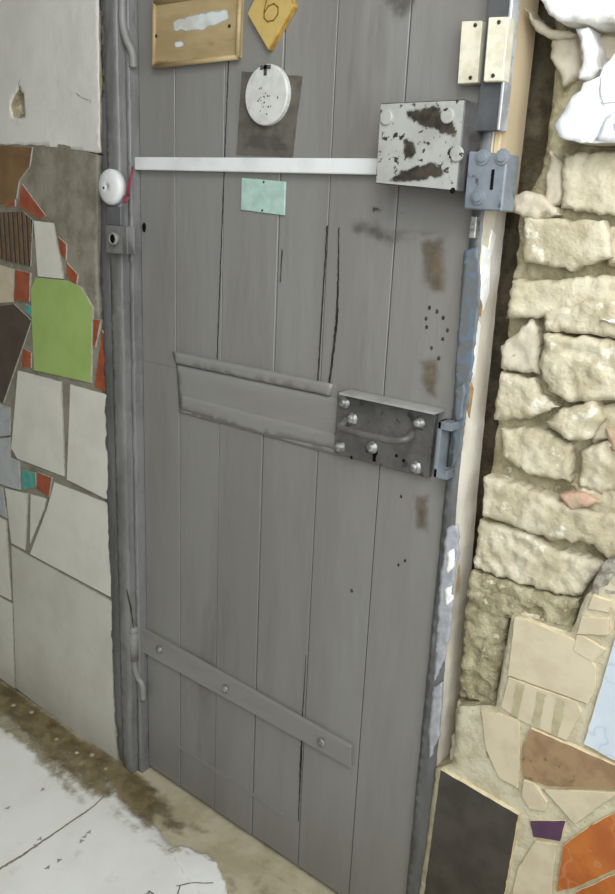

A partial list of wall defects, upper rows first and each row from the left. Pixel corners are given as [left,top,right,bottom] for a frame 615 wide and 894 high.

flaking render [16,86,25,118]
flaking render [425,0,615,761]
leakage [0,687,178,828]